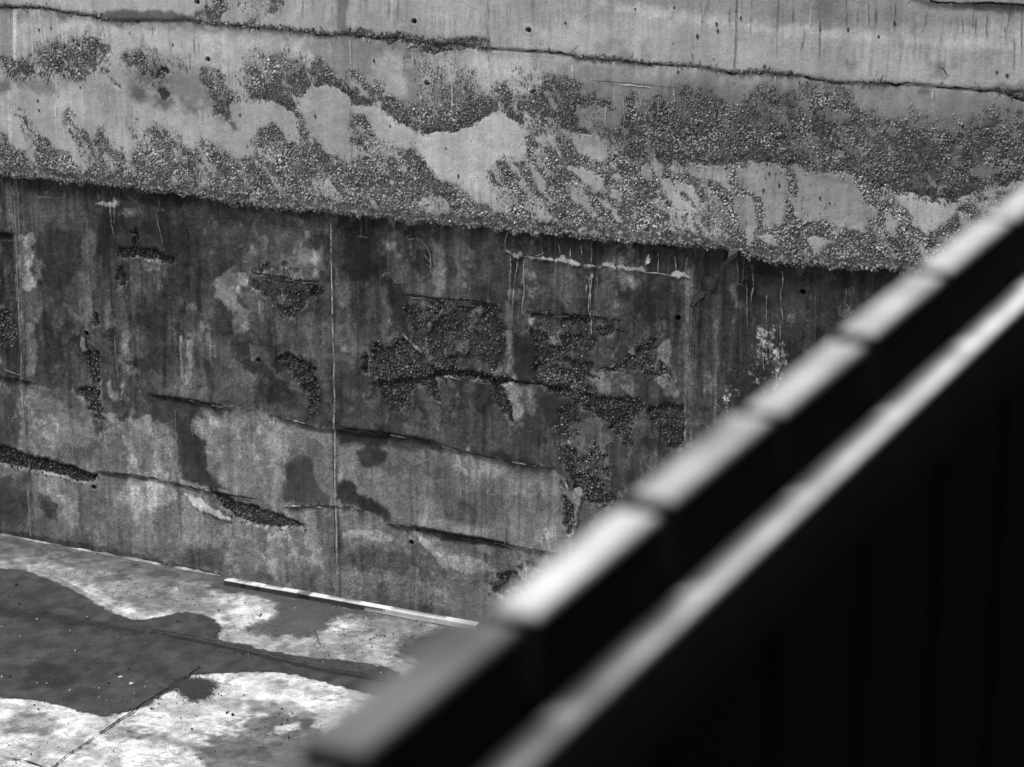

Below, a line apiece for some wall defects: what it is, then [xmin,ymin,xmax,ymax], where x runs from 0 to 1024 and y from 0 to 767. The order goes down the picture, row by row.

crack [0,2,1022,123]
spalling [0,25,1024,275]
spalling [114,228,177,289]
spalling [278,352,321,415]
spalling [358,298,516,422]
spalling [525,309,688,538]
spalling [0,445,99,485]
crack [98,469,252,500]
spalling [210,489,307,531]
water stain [281,455,390,520]
water stain [0,568,394,716]
water stain [389,626,449,656]